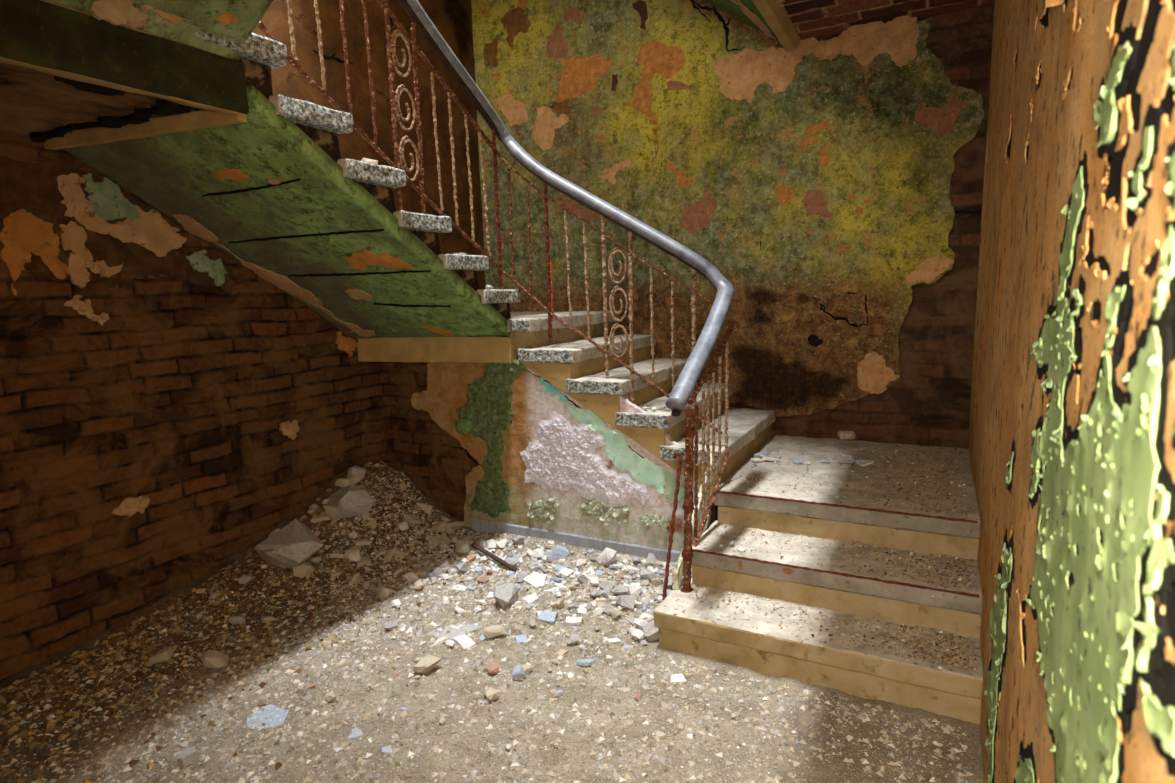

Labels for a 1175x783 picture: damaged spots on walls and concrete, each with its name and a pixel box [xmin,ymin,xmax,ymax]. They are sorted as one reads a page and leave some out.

peeling [89,0,190,28]
peeling [714,15,919,103]
spalling [29,99,191,142]
peeling [171,213,376,357]
leakage [749,290,776,324]
crack [819,292,869,327]
peeling [905,256,954,284]
leakage [734,346,846,409]
peeling [857,352,899,394]
peeling [984,0,1175,783]
peeling [456,359,527,518]
peeling [520,378,684,531]